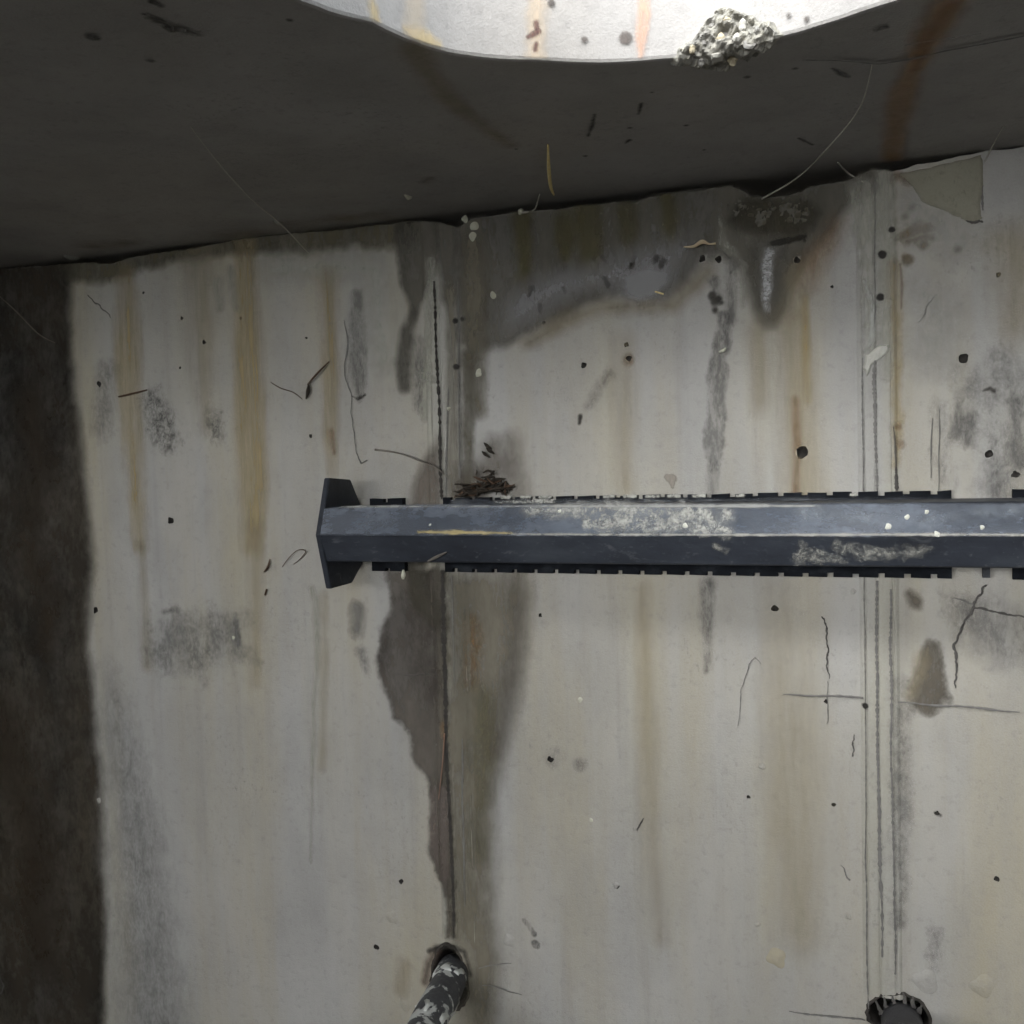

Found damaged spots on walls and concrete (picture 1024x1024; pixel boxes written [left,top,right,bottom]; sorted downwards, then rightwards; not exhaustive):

spalling [670,7,784,72]
water stain [0,169,892,1024]
crack [783,616,863,723]
water stain [911,641,950,715]
crack [898,585,1024,713]